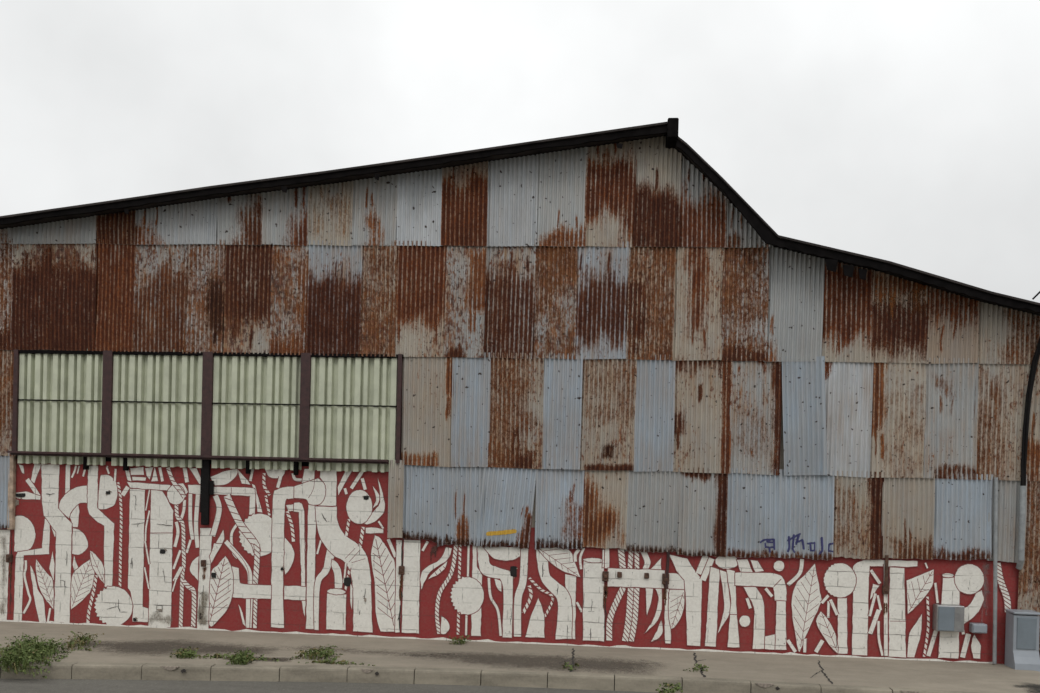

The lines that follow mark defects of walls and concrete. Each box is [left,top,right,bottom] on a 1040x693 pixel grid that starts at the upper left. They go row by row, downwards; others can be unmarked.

rust [0,143,855,560]
rust [822,262,992,560]
rust [934,309,1040,480]
rust [1018,413,1040,603]